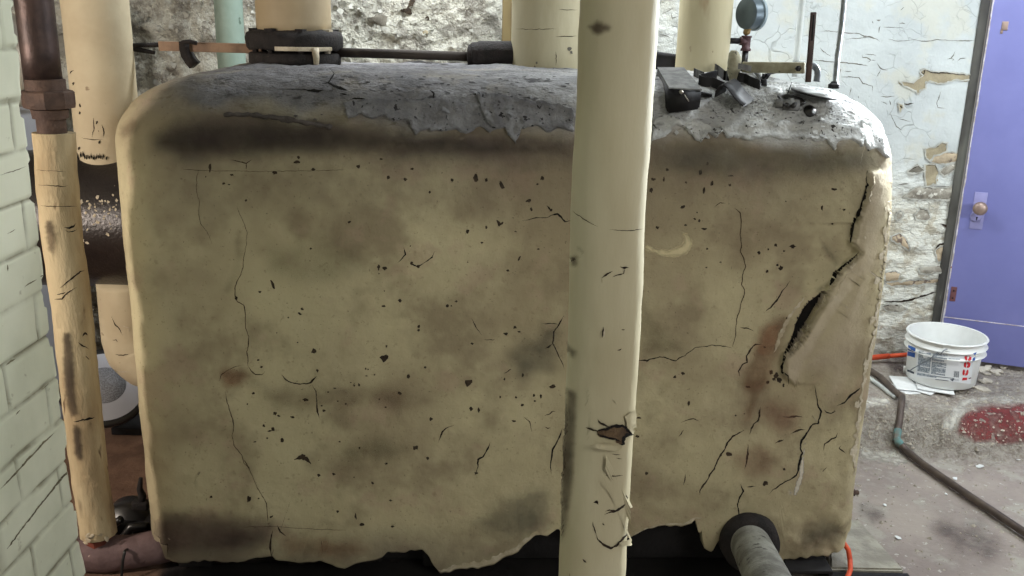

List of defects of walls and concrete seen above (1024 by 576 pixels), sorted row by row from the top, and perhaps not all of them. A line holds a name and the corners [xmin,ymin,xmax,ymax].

damp [160,127,377,150]
peeling [329,62,574,143]
peeling [897,68,970,113]
crack [523,206,640,231]
crack [602,147,869,384]
peeling [651,106,958,476]
damp [64,334,76,414]
crack [219,207,331,556]
crack [683,386,860,514]